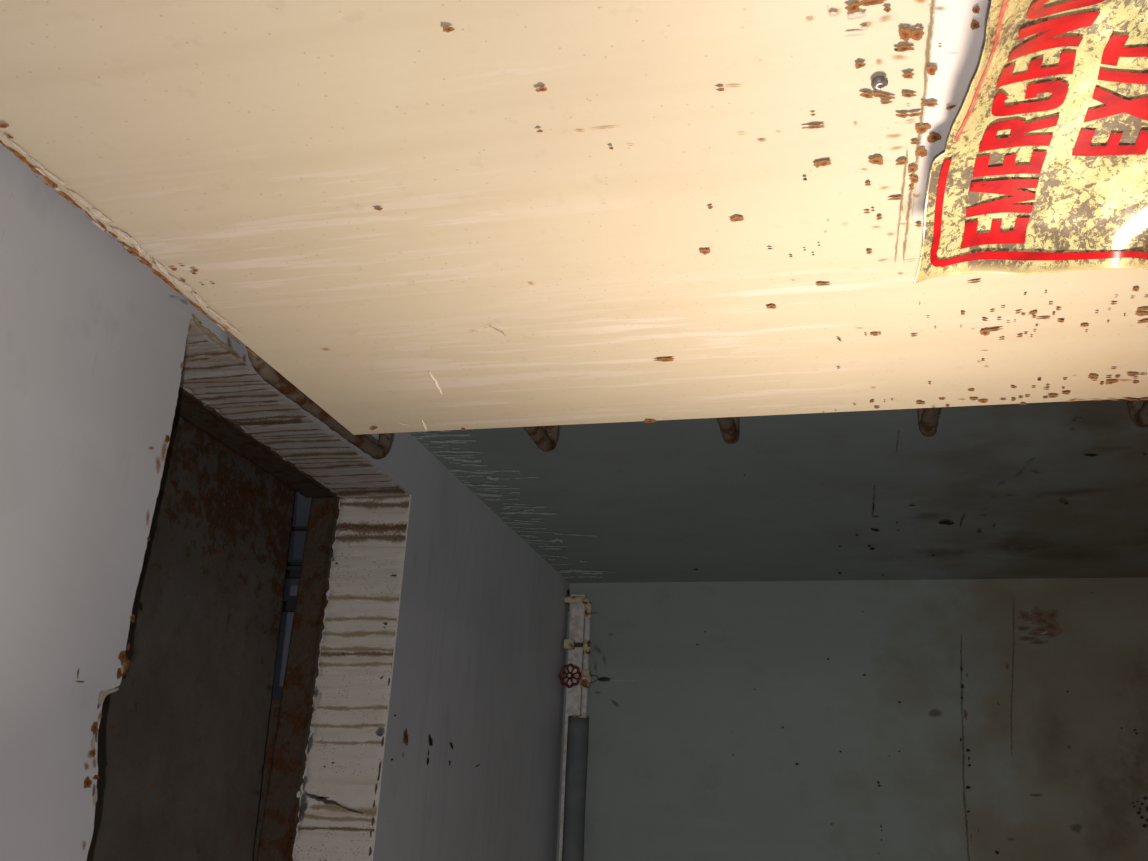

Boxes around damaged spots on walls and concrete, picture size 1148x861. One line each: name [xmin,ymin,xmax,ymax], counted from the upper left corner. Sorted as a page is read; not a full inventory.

rust [829,0,891,37]
rust [970,6,980,30]
rust [894,27,924,59]
rust [860,66,956,235]
rust [1088,368,1147,385]
rust [117,645,129,679]
rust [84,749,100,788]